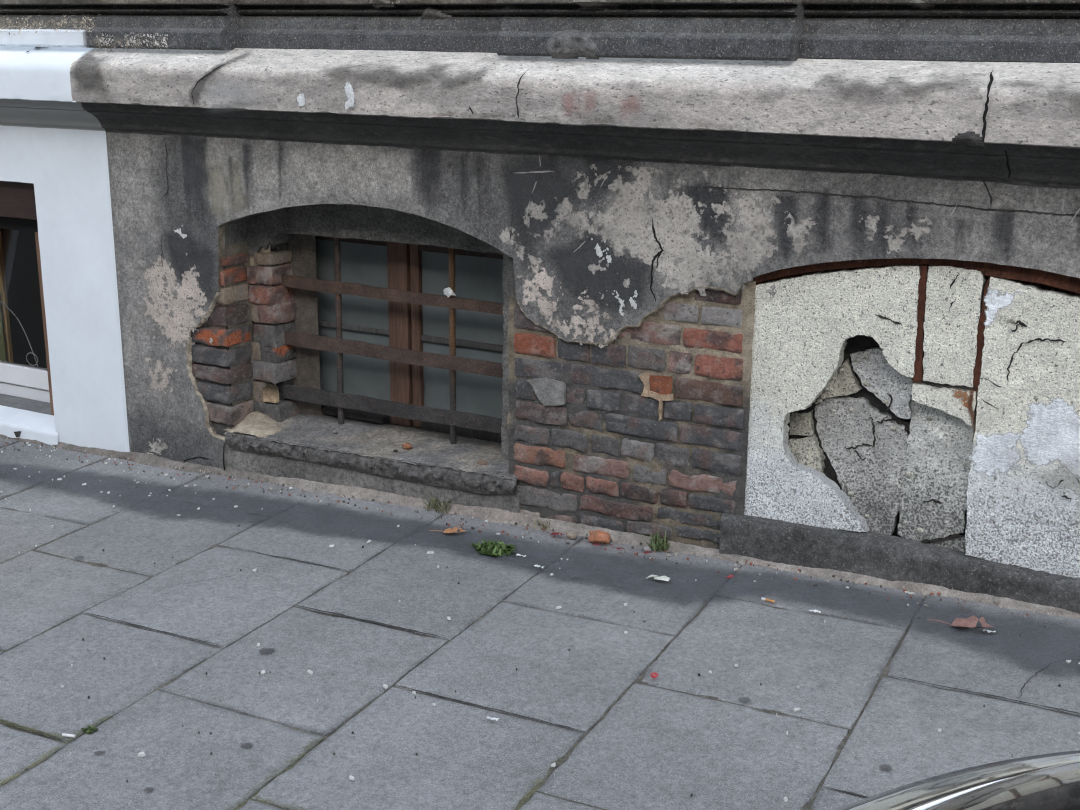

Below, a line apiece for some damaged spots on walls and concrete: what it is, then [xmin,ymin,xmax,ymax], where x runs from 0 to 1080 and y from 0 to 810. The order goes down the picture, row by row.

crack [684,71,1080,216]
crack [650,218,663,302]
water stain [687,186,728,237]
water stain [775,195,795,257]
water stain [853,197,865,235]
water stain [996,211,1012,253]
flaking render [141,164,816,549]
crack [919,338,1070,410]
crack [845,393,910,461]
spalling [787,335,977,552]